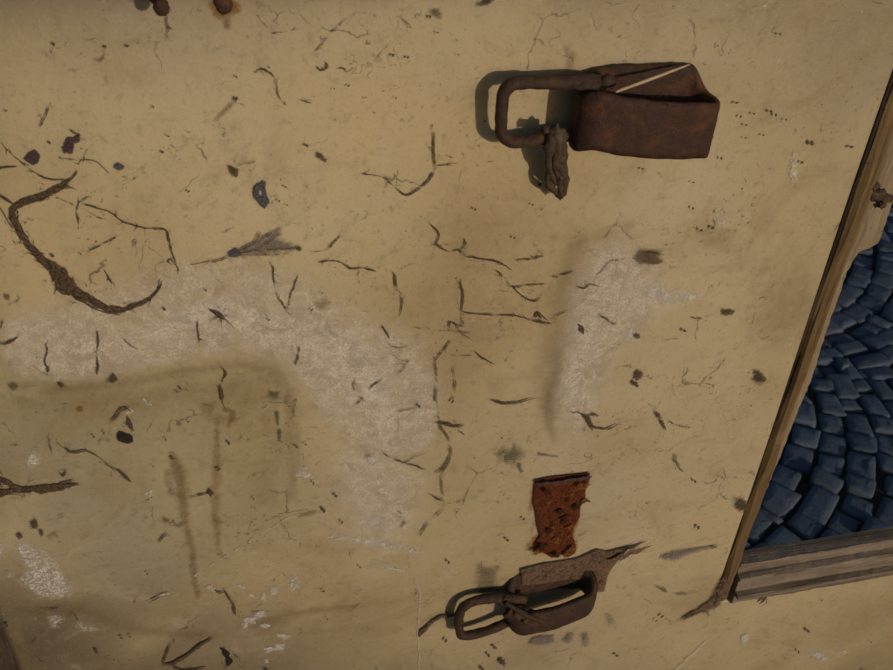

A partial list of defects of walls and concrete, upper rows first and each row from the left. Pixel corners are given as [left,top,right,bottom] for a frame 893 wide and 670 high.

crack [364,125,457,202]
crack [0,143,210,376]
crack [270,261,298,314]
crack [317,223,637,537]
crack [0,435,132,498]
rust [528,472,592,558]